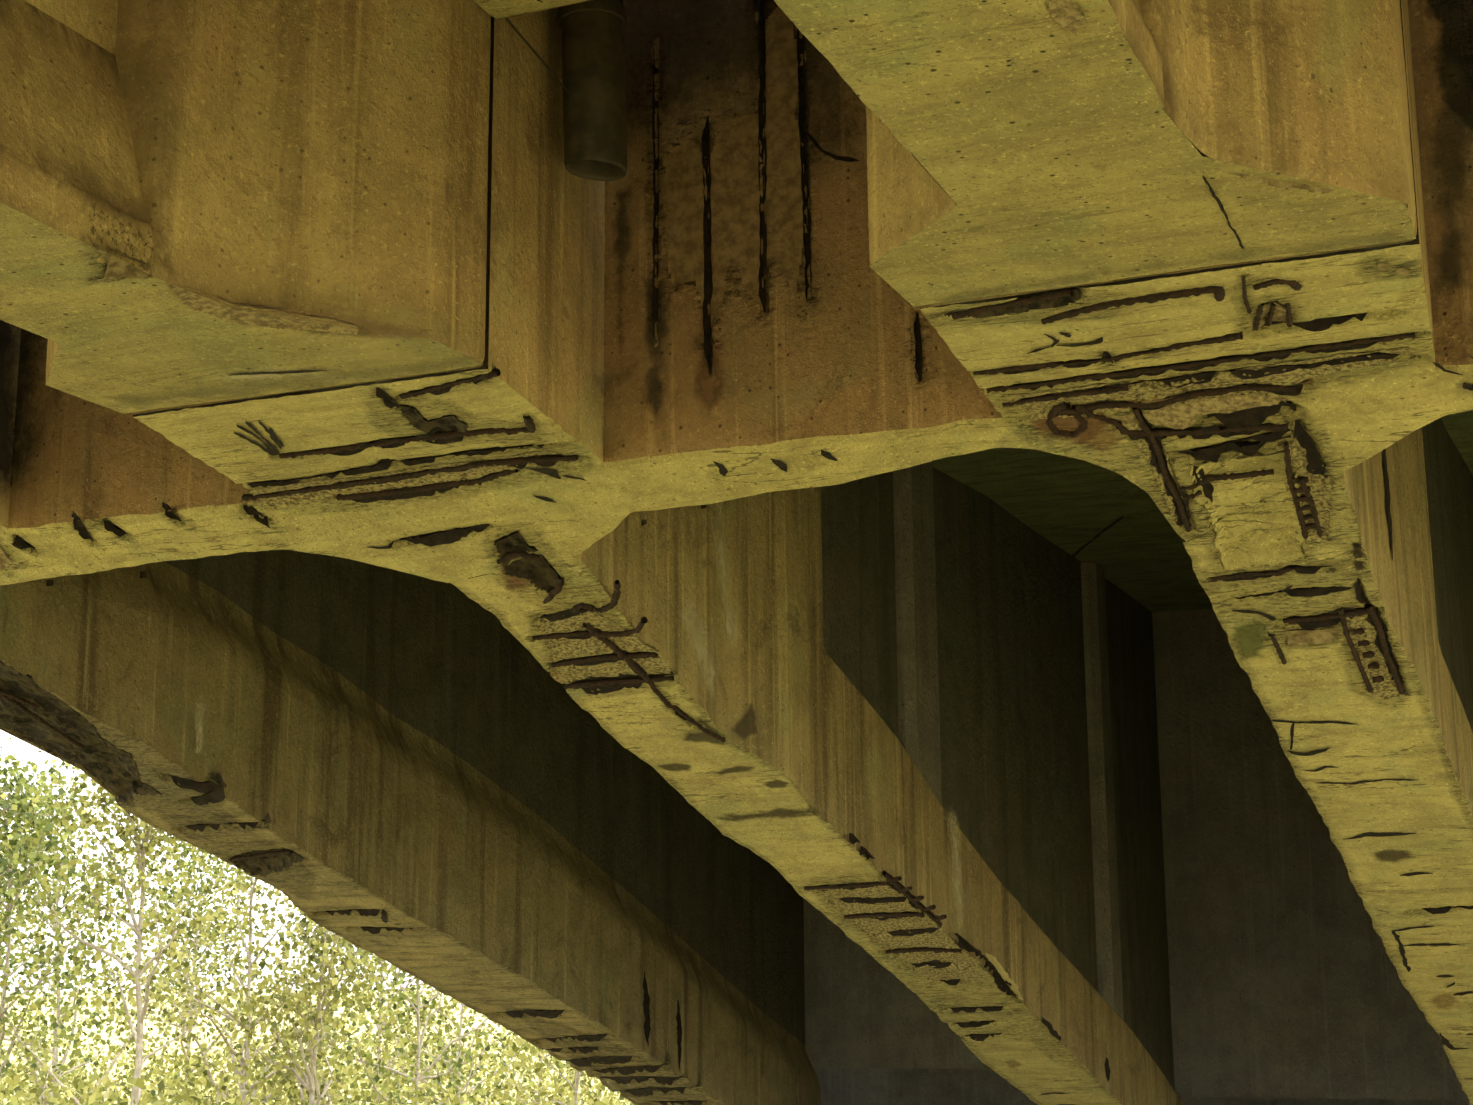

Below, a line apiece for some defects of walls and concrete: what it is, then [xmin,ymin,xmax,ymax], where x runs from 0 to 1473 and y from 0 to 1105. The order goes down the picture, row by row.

crack [1203,176,1244,249]
water stain [1428,0,1473,287]
water stain [0,320,41,489]
spalling [234,368,578,518]
corrosion [695,342,723,408]
spalling [944,277,1415,570]
spalling [12,535,35,550]
spalling [71,511,128,542]
spalling [367,523,725,743]
spalling [0,660,227,806]
spalling [228,848,305,876]
spalling [542,1000,709,1105]